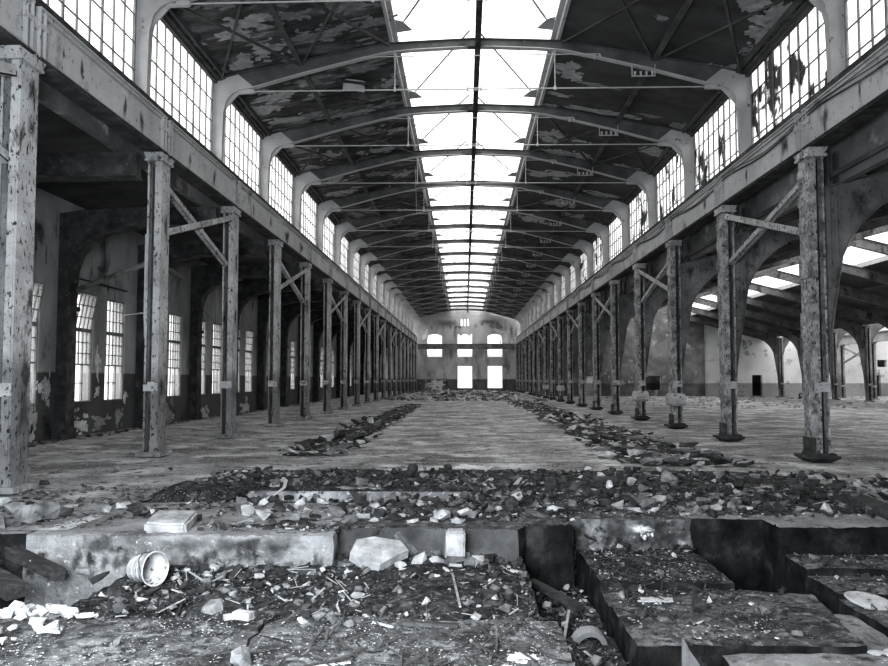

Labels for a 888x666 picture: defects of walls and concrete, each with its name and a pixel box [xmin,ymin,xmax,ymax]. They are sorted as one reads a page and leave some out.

peeling [188,0,399,73]
peeling [710,0,796,69]
peeling [327,57,386,78]
peeling [555,61,622,91]
peeling [245,76,407,126]
peeling [542,91,694,130]
peeling [535,129,593,160]
peeling [526,169,577,180]
peeling [74,391,128,435]